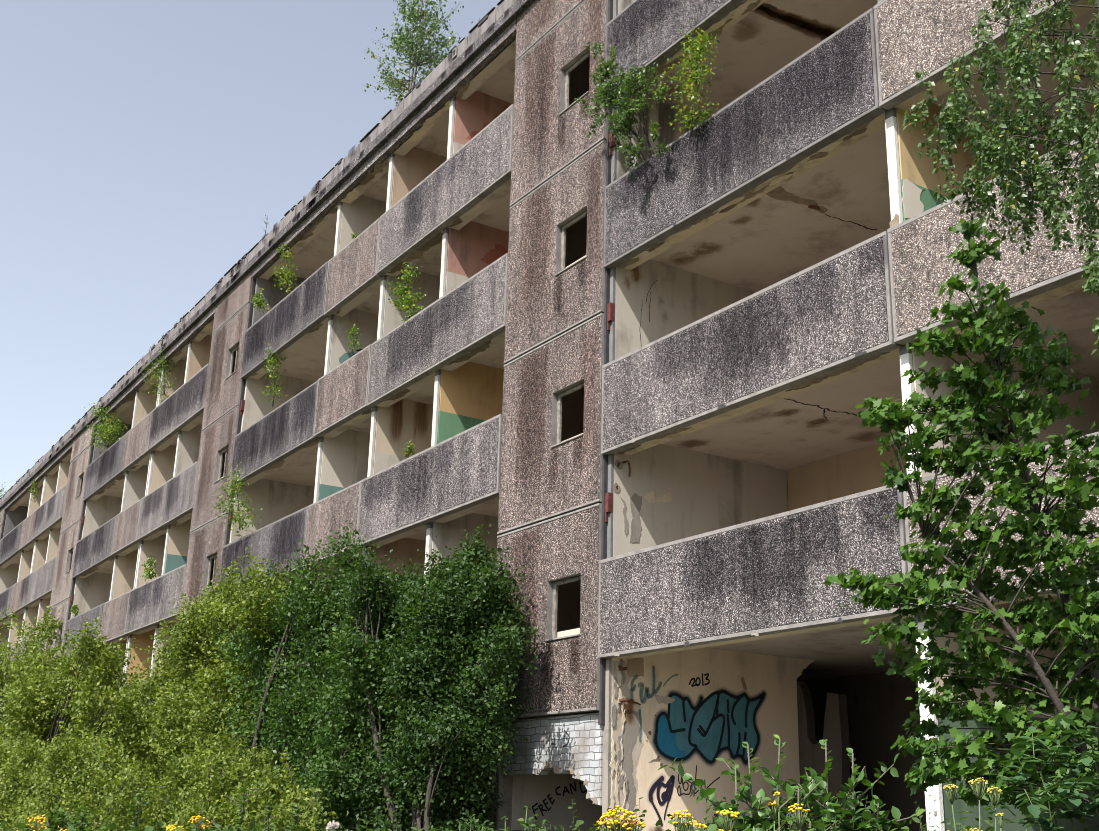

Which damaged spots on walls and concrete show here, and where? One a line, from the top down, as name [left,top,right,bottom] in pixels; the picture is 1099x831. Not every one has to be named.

crack [825,214,877,230]
crack [784,398,860,421]
flaking render [536,653,663,831]